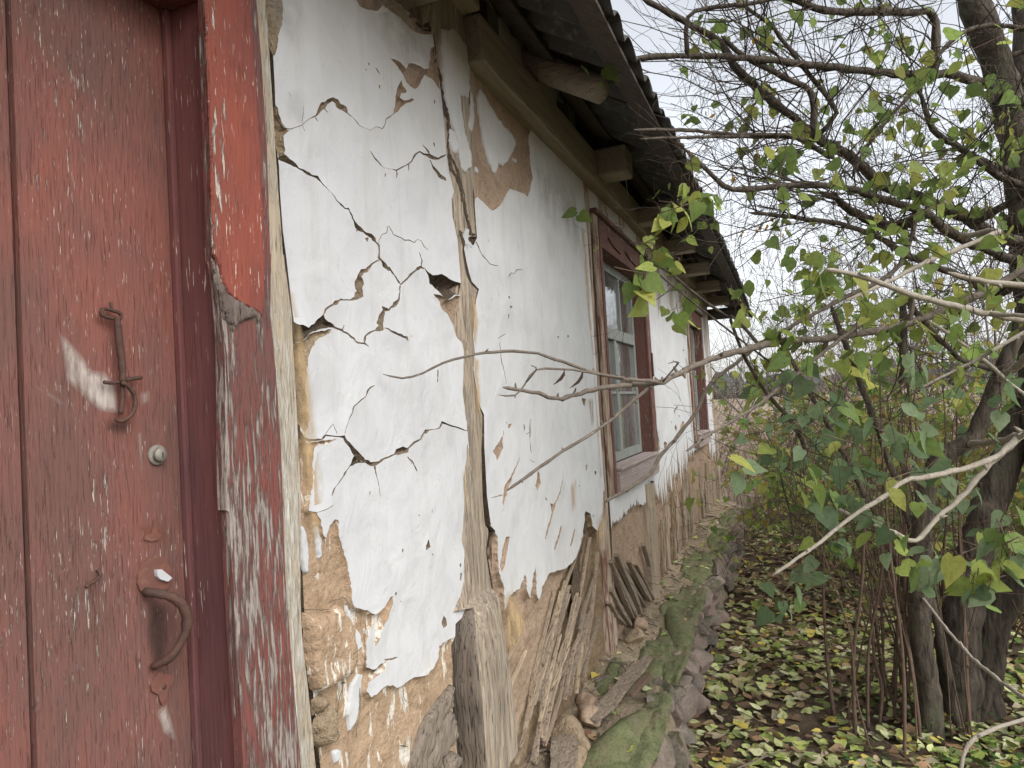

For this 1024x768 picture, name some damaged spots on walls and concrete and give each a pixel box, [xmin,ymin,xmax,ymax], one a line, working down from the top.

crack [276,157,428,347]
crack [273,35,521,289]
flaking render [356,0,533,211]
flaking render [292,315,455,768]
crack [298,385,467,516]
flaking render [485,315,717,768]